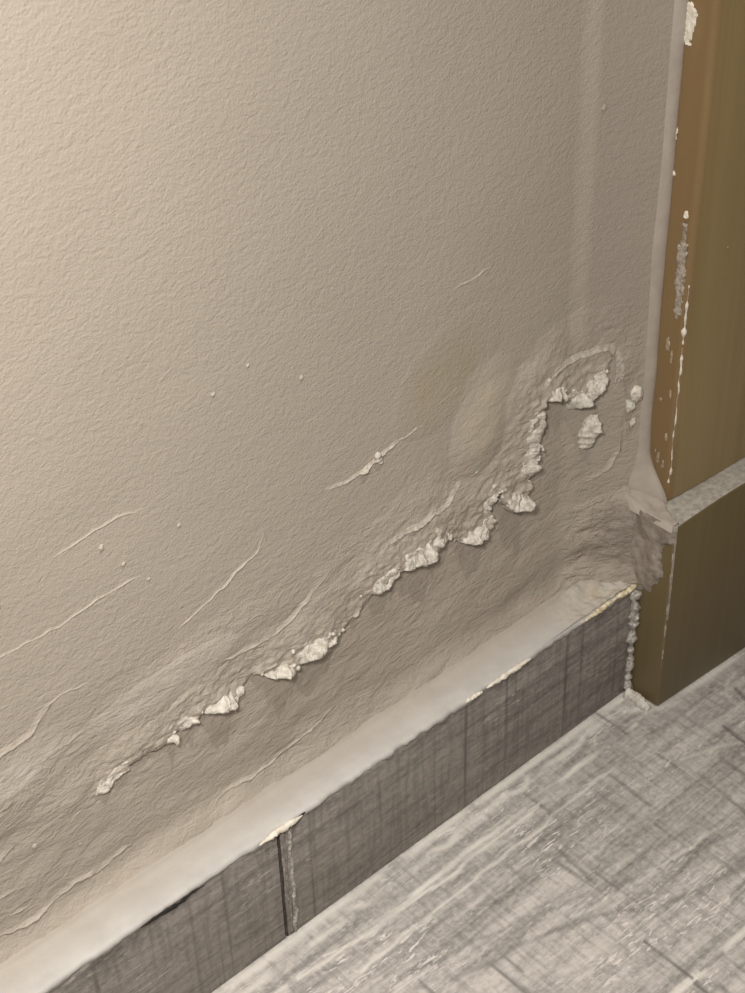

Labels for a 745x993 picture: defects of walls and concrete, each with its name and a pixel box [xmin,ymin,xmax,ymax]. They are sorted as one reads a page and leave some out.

peeling [88,294,644,800]